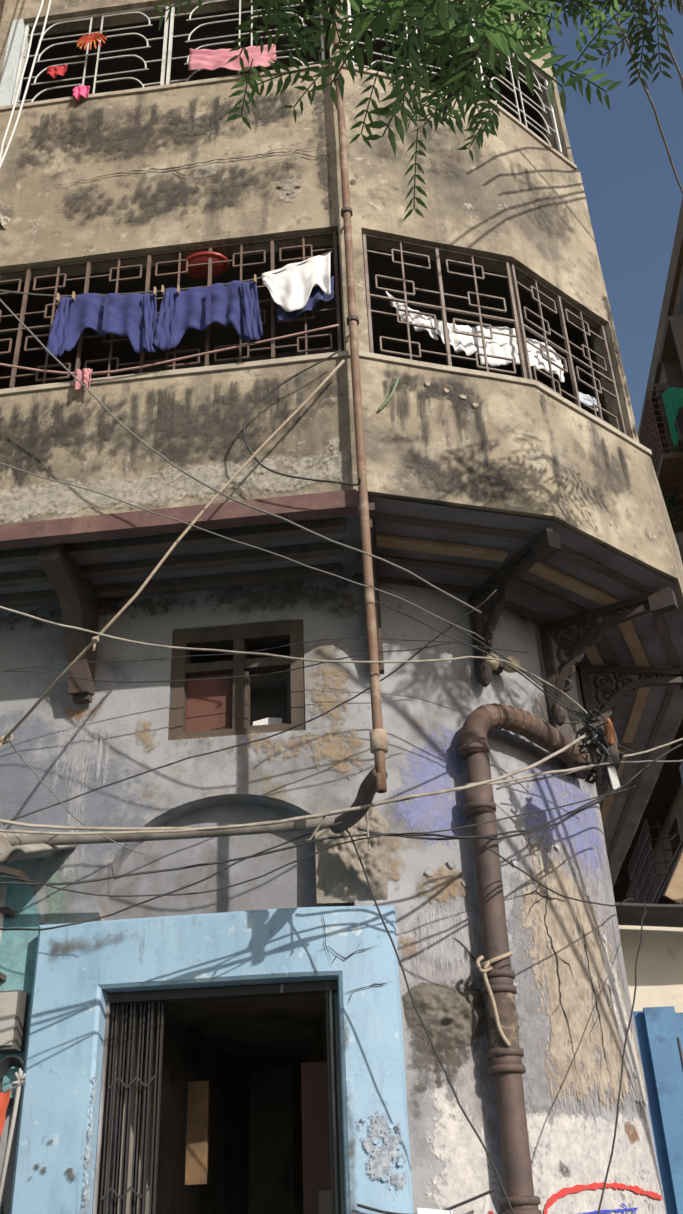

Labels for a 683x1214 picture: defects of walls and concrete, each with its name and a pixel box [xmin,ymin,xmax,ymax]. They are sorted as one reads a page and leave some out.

water stain [19,91,332,208]
water stain [65,161,301,223]
water stain [603,296,638,435]
water stain [0,375,350,523]
water stain [383,370,526,501]
water stain [593,438,631,493]
peeling [418,861,472,902]
crack [317,913,378,963]
crack [344,981,391,1001]
crack [524,845,630,1082]
spalling [358,1111,407,1194]